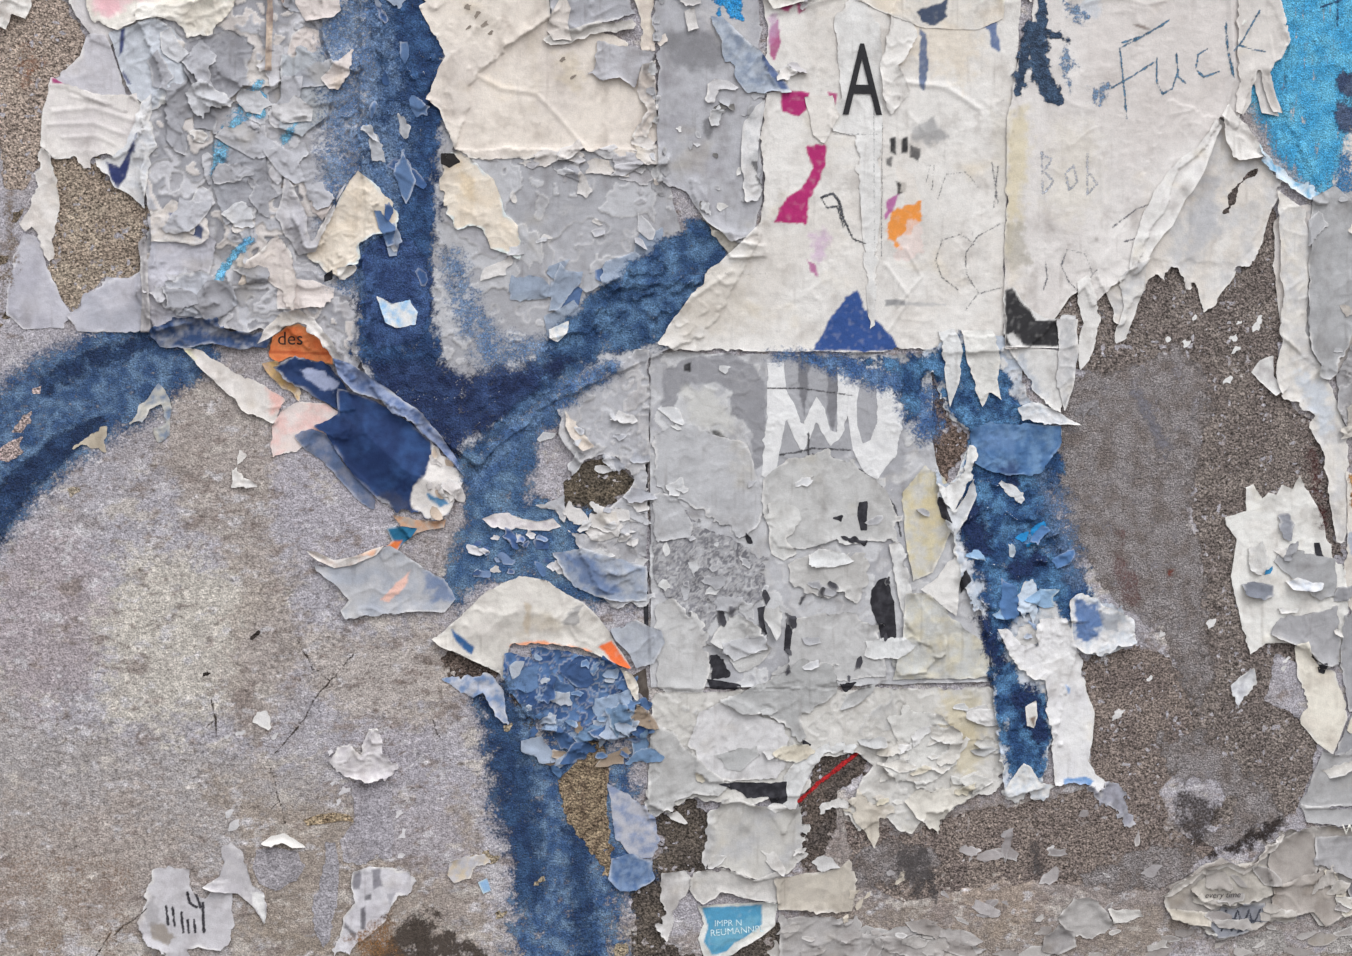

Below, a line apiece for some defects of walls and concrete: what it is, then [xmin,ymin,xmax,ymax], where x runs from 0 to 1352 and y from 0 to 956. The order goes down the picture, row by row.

peeling [374,0,405,23]
peeling [0,0,354,320]
peeling [360,95,430,256]
peeling [519,0,670,198]
peeling [676,93,766,158]
peeling [480,212,690,338]
peeling [426,447,466,521]
peeling [466,527,563,578]
peeling [609,410,638,441]
spalling [562,427,754,620]
spalling [714,208,1352,956]
spalling [441,651,727,956]